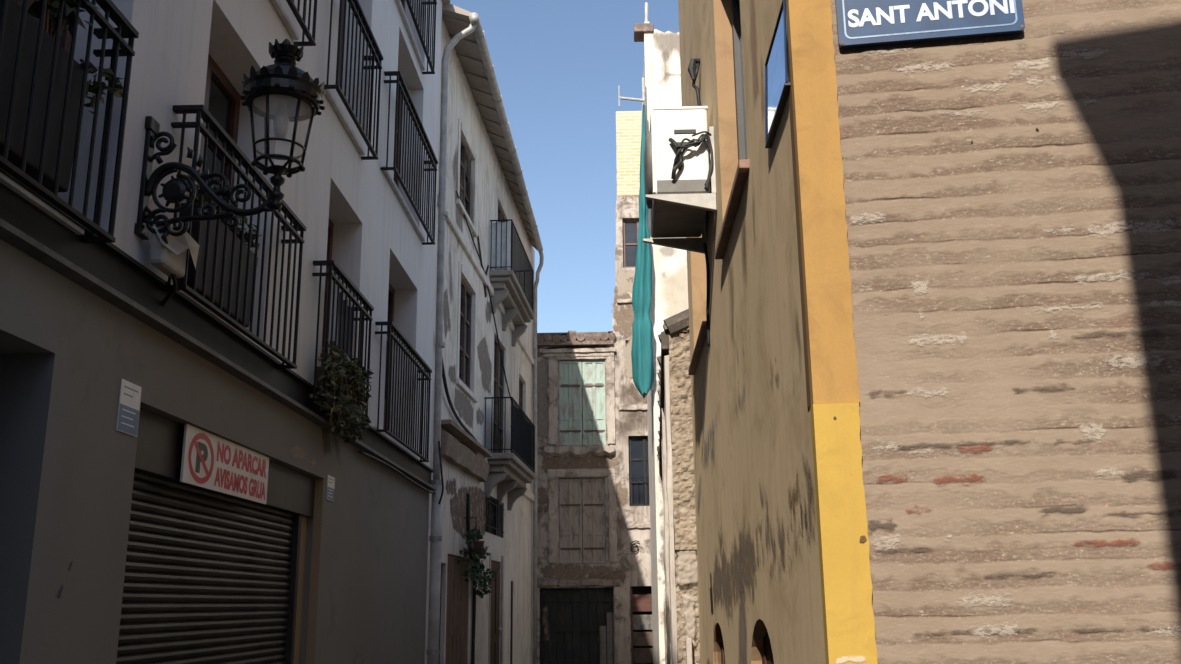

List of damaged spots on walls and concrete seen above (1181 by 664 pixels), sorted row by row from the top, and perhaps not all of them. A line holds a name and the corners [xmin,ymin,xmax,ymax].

damp [654,34,680,78]
spalling [612,278,634,387]
peeling [537,359,619,472]
peeling [445,479,493,540]
peeling [537,488,549,512]
peeling [788,455,814,534]
peeling [541,563,626,587]
peeling [660,530,698,664]
peeling [713,491,796,615]